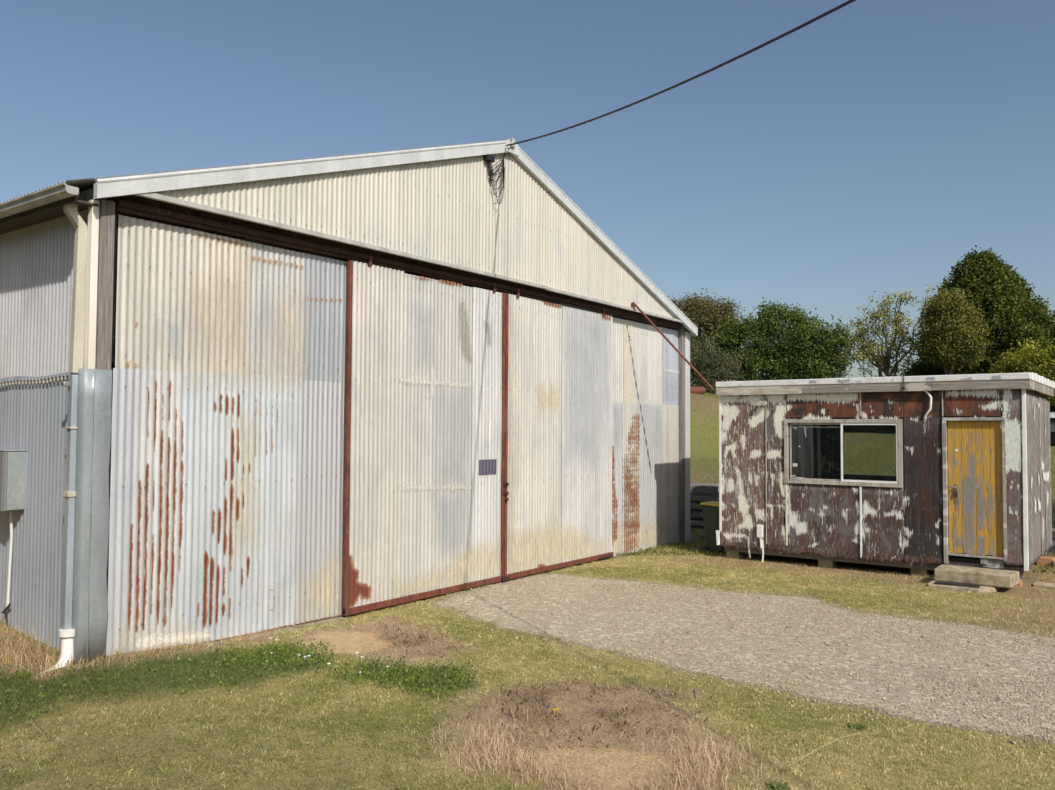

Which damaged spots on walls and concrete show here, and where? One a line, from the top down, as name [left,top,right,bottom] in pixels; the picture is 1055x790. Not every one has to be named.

corrosion [128,380,184,632]
corrosion [197,393,278,628]
corrosion [221,556,371,640]
corrosion [612,414,641,552]
peeling [718,375,1051,566]